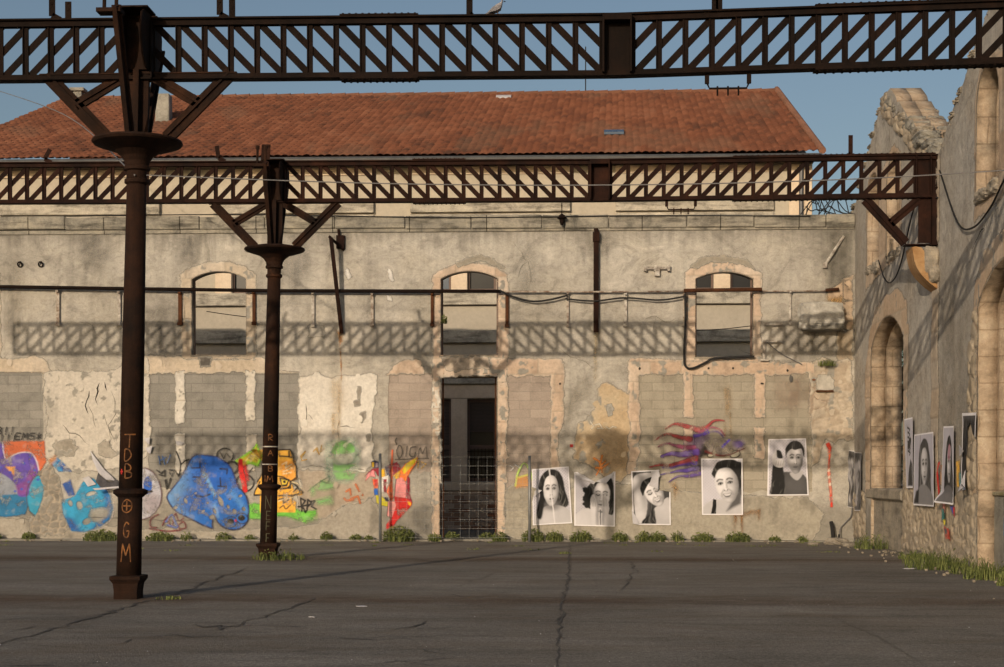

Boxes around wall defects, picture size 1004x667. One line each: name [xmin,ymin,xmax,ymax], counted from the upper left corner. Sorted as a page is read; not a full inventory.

flaking render [0,355,122,539]
flaking render [143,354,265,459]
flaking render [277,359,425,539]
flaking render [505,382,824,540]
flaking render [142,527,260,539]
crack [1,565,256,643]
crack [113,597,315,645]
crack [552,546,584,667]